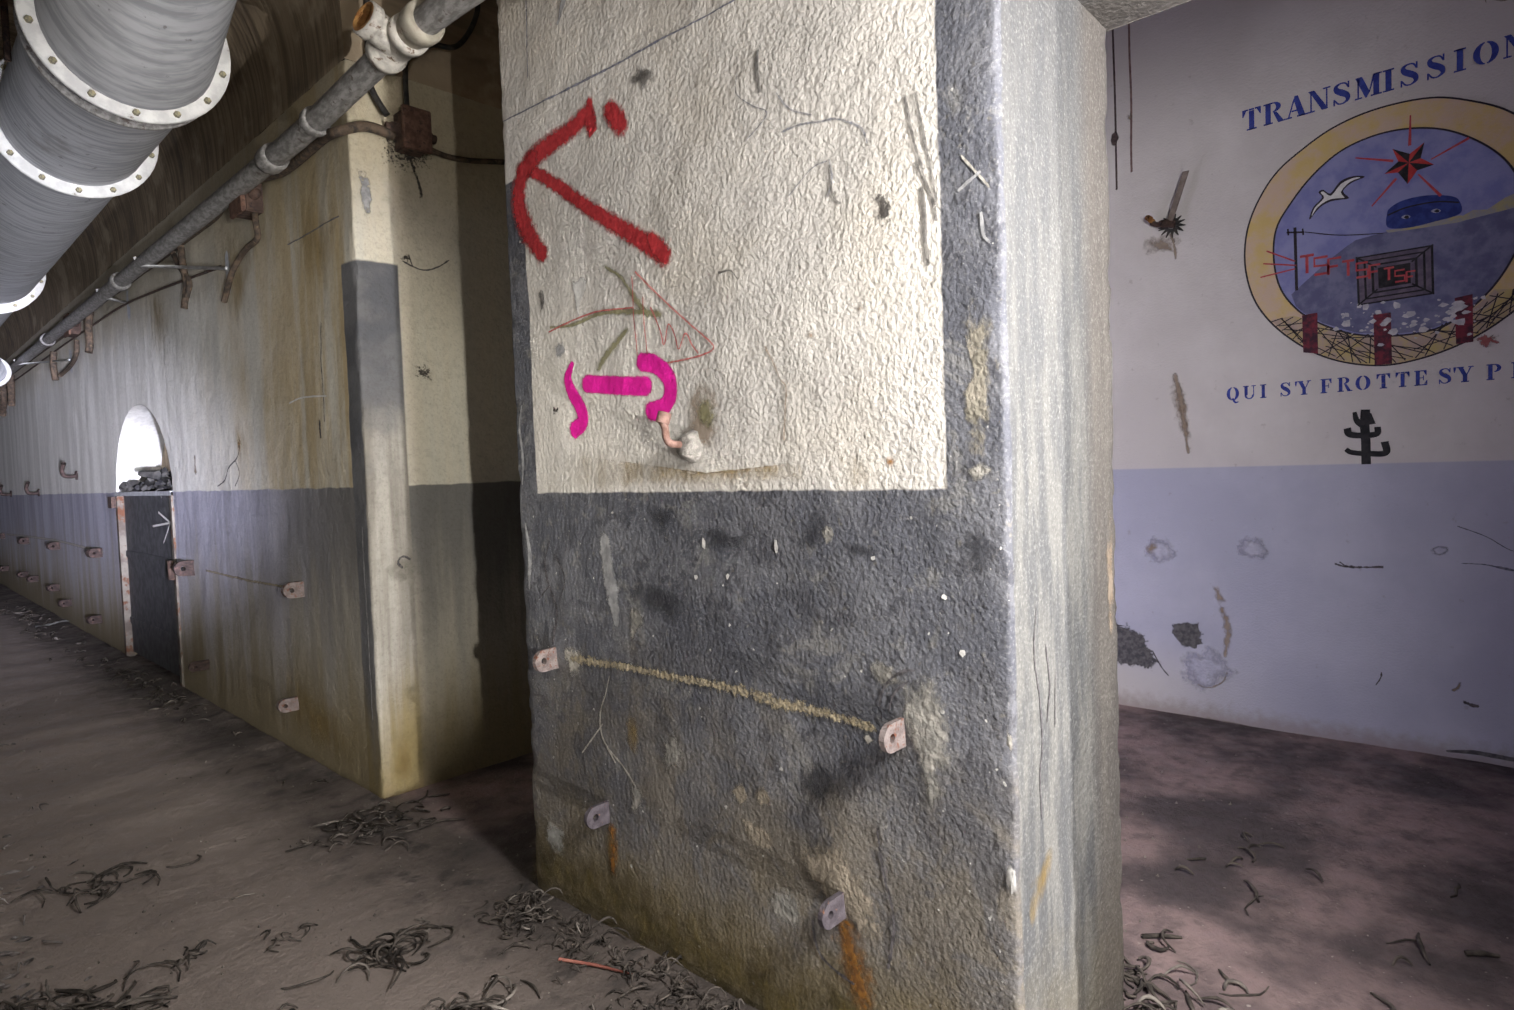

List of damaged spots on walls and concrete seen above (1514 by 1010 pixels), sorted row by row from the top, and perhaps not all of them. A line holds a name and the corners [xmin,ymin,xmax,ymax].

spalling [1107,546,1169,676]
spalling [1172,622,1203,648]
rust [839,920,872,1010]